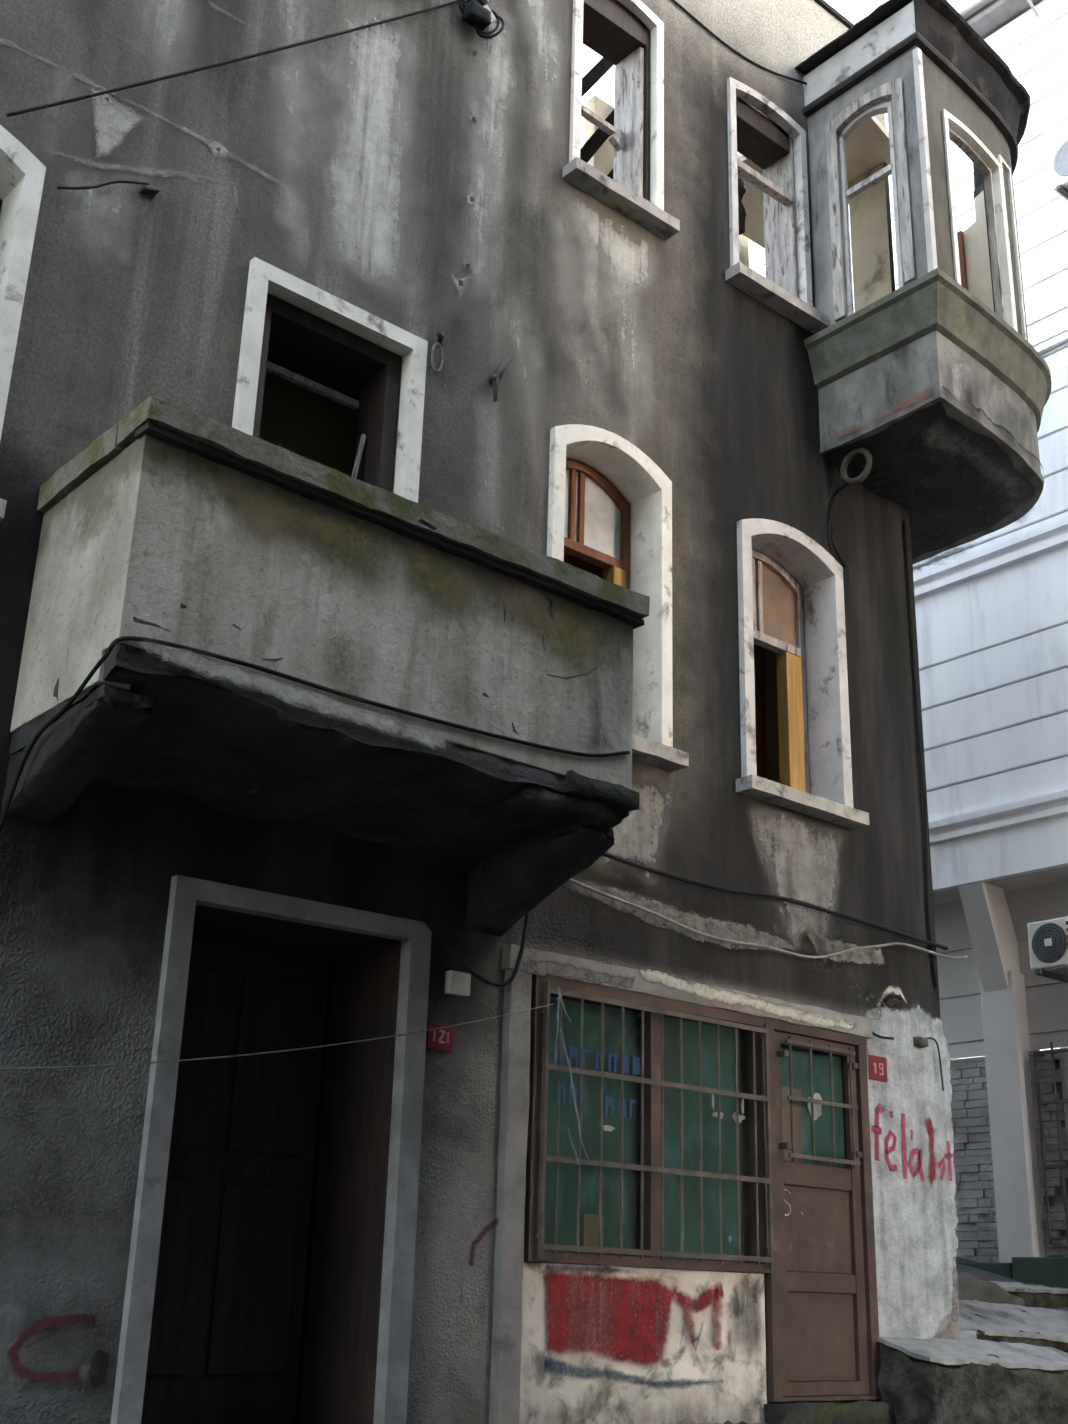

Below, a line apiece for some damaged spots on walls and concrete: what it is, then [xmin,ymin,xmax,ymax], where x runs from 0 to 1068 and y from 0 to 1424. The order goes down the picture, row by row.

damp [332,24,400,276]
damp [483,24,509,155]
damp [528,0,553,56]
flaking render [563,878,885,965]